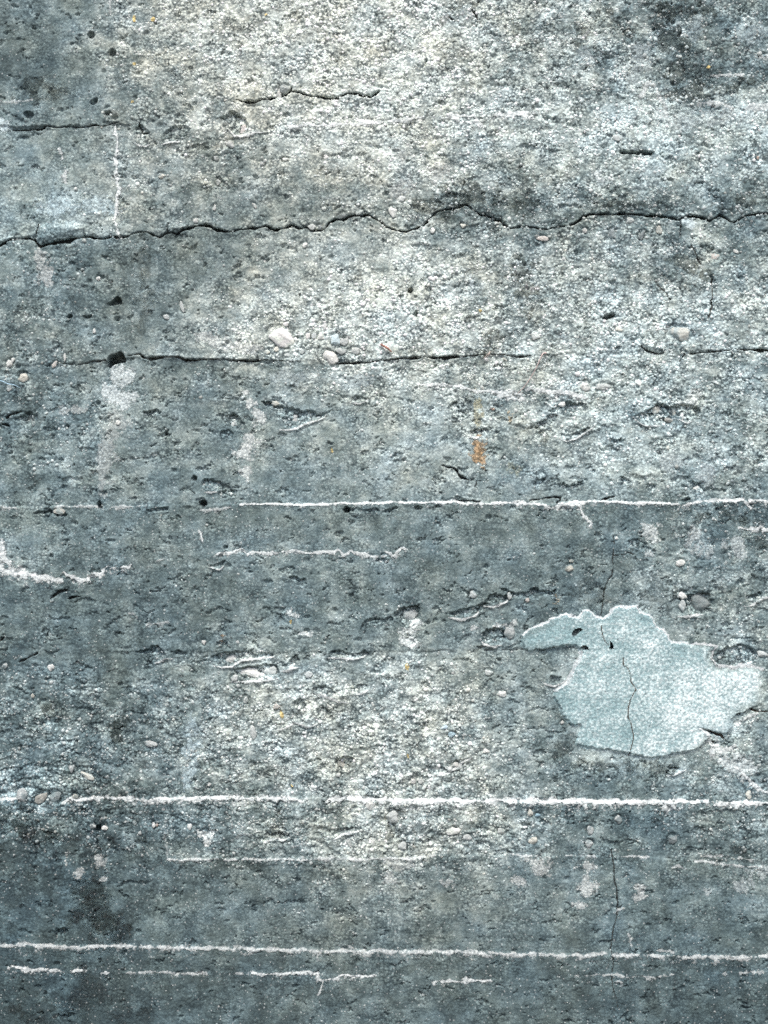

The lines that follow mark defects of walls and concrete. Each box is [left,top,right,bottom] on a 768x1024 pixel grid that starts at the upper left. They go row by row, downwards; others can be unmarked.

crack [0,204,768,318]
crack [63,353,294,366]
crack [337,354,531,365]
crack [641,345,768,362]
rust [470,435,487,468]
crack [530,495,561,503]